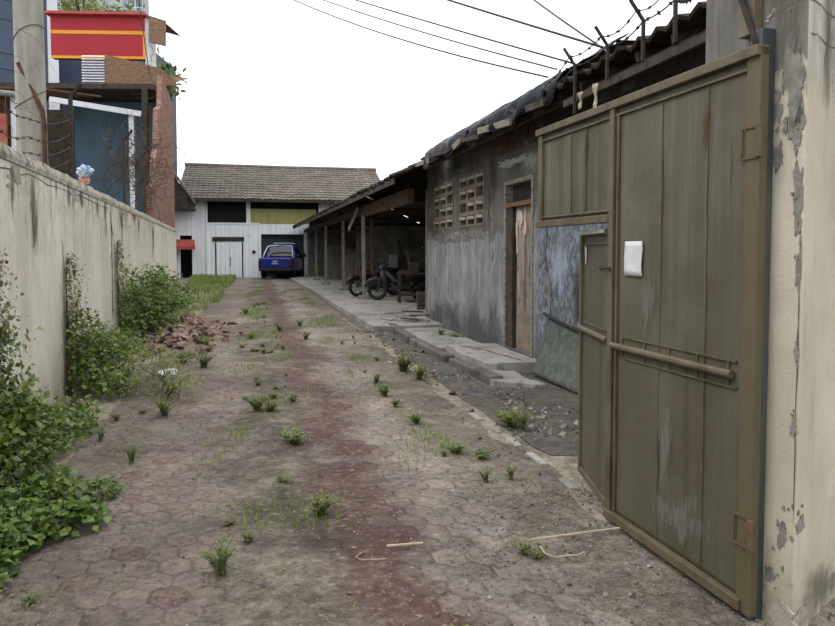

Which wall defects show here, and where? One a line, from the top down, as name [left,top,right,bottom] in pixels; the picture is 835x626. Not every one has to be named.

crack [811,0,835,104]
peeling [772,32,807,296]
peeling [772,504,805,550]
spalling [763,566,809,626]